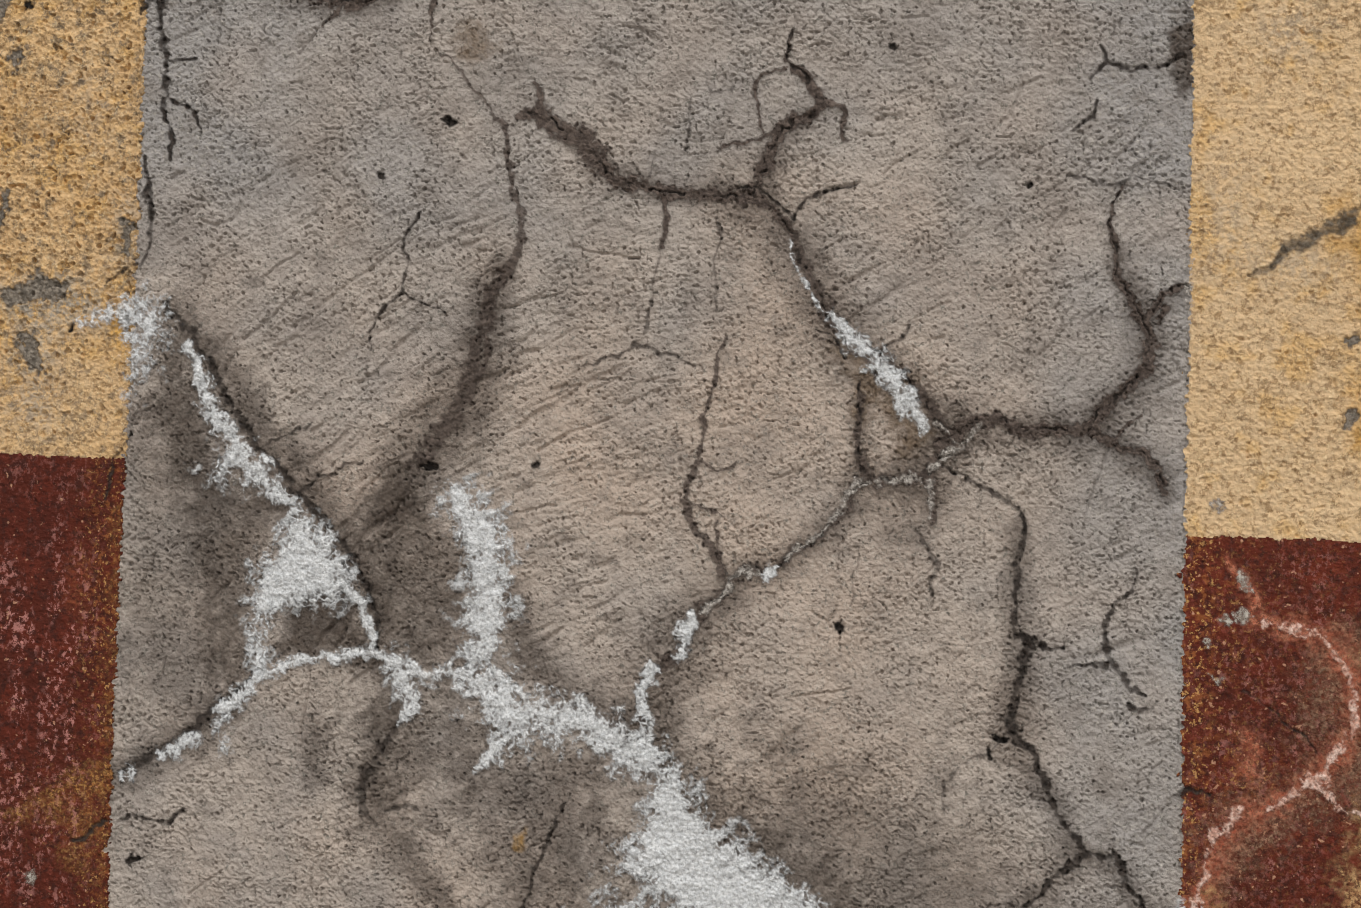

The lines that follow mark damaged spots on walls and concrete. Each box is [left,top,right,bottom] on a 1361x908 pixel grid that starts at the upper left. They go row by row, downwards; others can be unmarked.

peeling [0,188,10,226]
peeling [13,330,47,377]
peeling [0,267,69,307]
crack [106,0,202,283]
crack [162,301,380,651]
crack [369,211,446,350]
crack [406,0,1191,908]
damp [671,241,982,660]
crack [1247,207,1358,277]
peeling [1342,408,1360,430]
peeling [1344,335,1360,348]
damp [76,283,839,908]